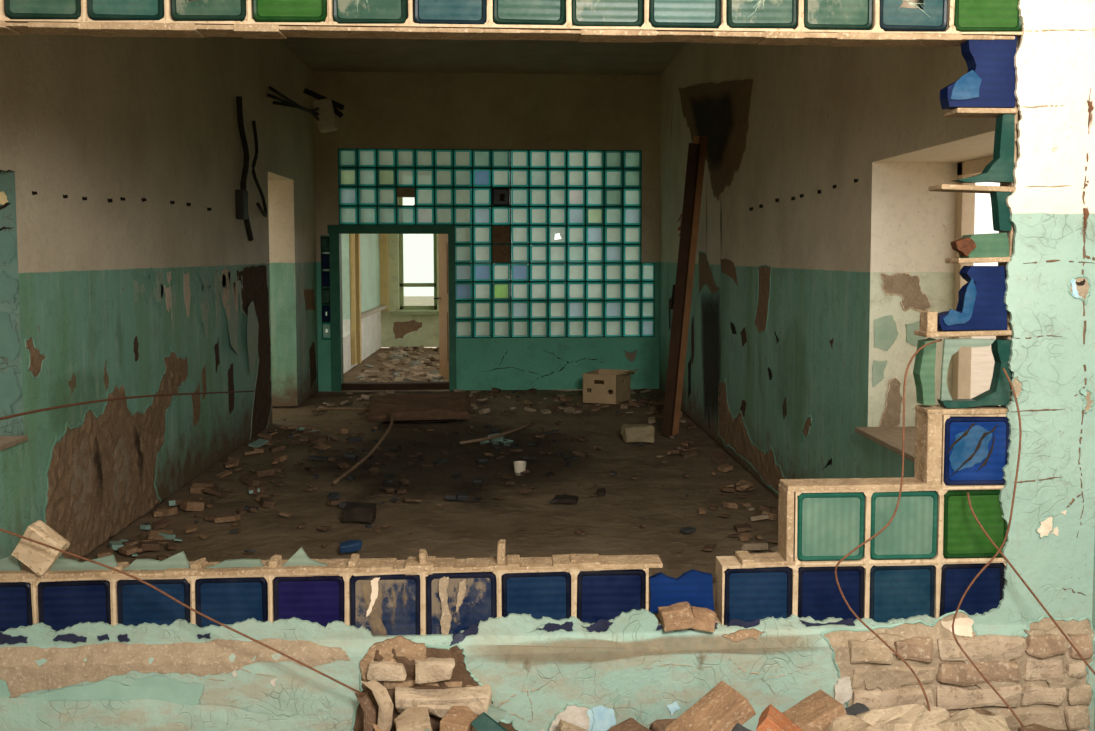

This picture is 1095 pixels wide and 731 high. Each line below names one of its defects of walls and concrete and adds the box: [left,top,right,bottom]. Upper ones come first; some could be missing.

spalling [1067,274,1091,305]
spalling [872,273,931,427]
spalling [43,263,271,561]
peeling [538,619,613,632]
peeling [715,618,760,629]
peeling [0,623,494,731]
spalling [800,610,1095,731]
spalling [498,719,521,731]
peeling [540,703,616,731]